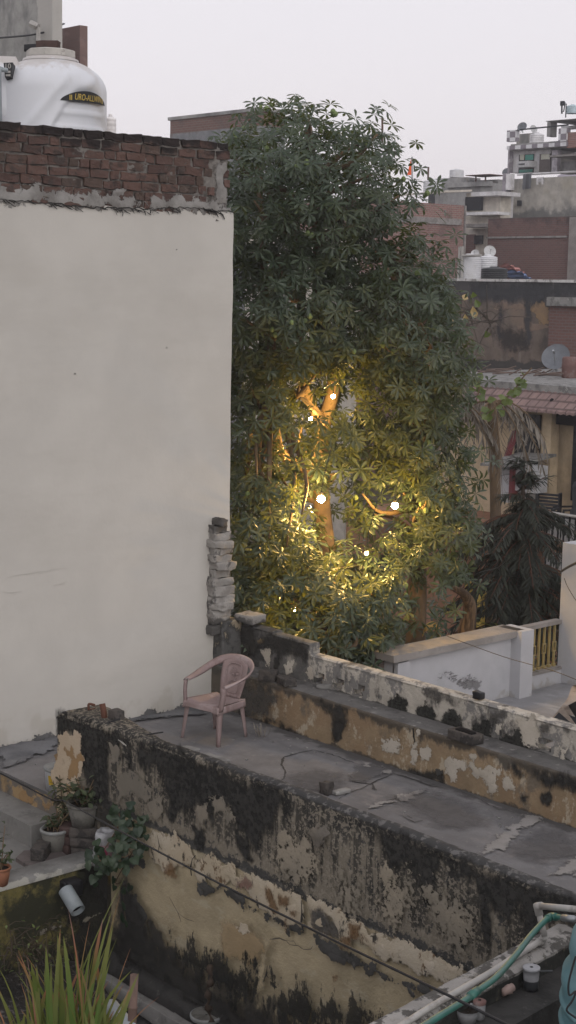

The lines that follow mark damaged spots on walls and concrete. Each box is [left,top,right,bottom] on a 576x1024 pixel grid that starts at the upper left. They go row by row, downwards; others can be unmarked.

spalling [3,199,236,219]
water stain [472,282,575,353]
peeling [50,730,85,799]
water stain [2,710,291,862]
crack [280,728,513,822]
water stain [422,687,453,704]
peeling [407,746,515,796]
peeling [477,713,540,748]
water stain [512,764,576,807]
flaking render [108,742,483,998]
water stain [374,827,575,946]
water stain [86,870,384,1024]